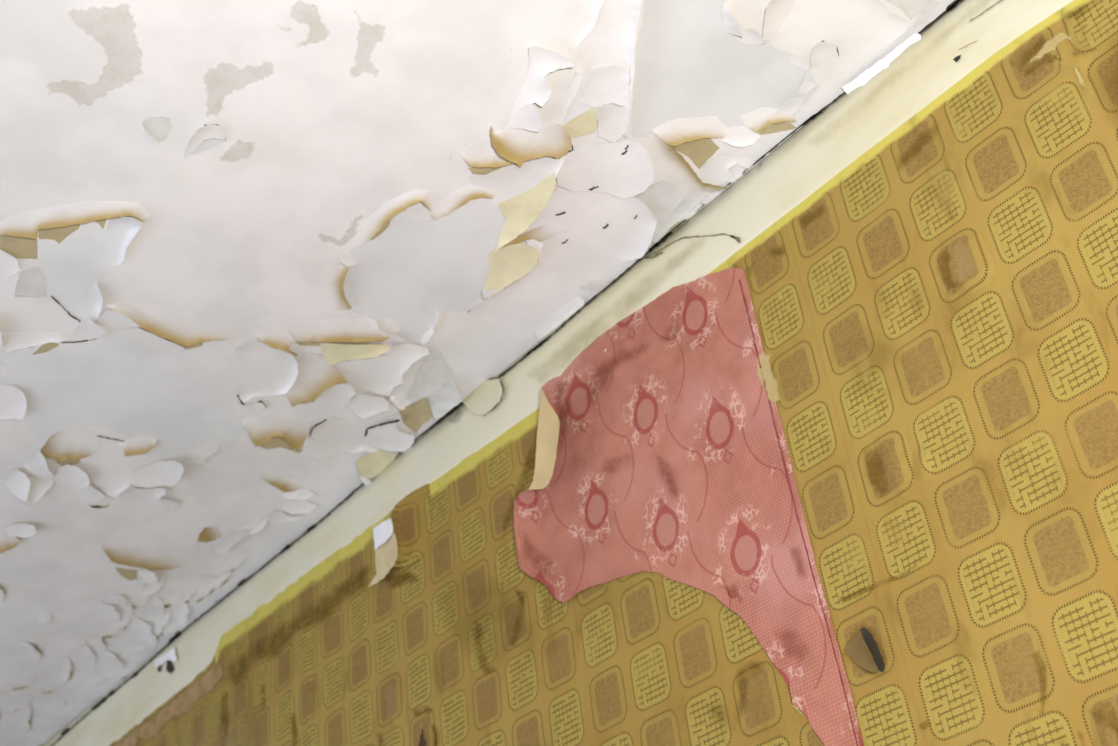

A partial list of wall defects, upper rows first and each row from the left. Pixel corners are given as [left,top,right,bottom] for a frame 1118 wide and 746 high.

peeling [0,0,839,719]
peeling [822,0,942,94]